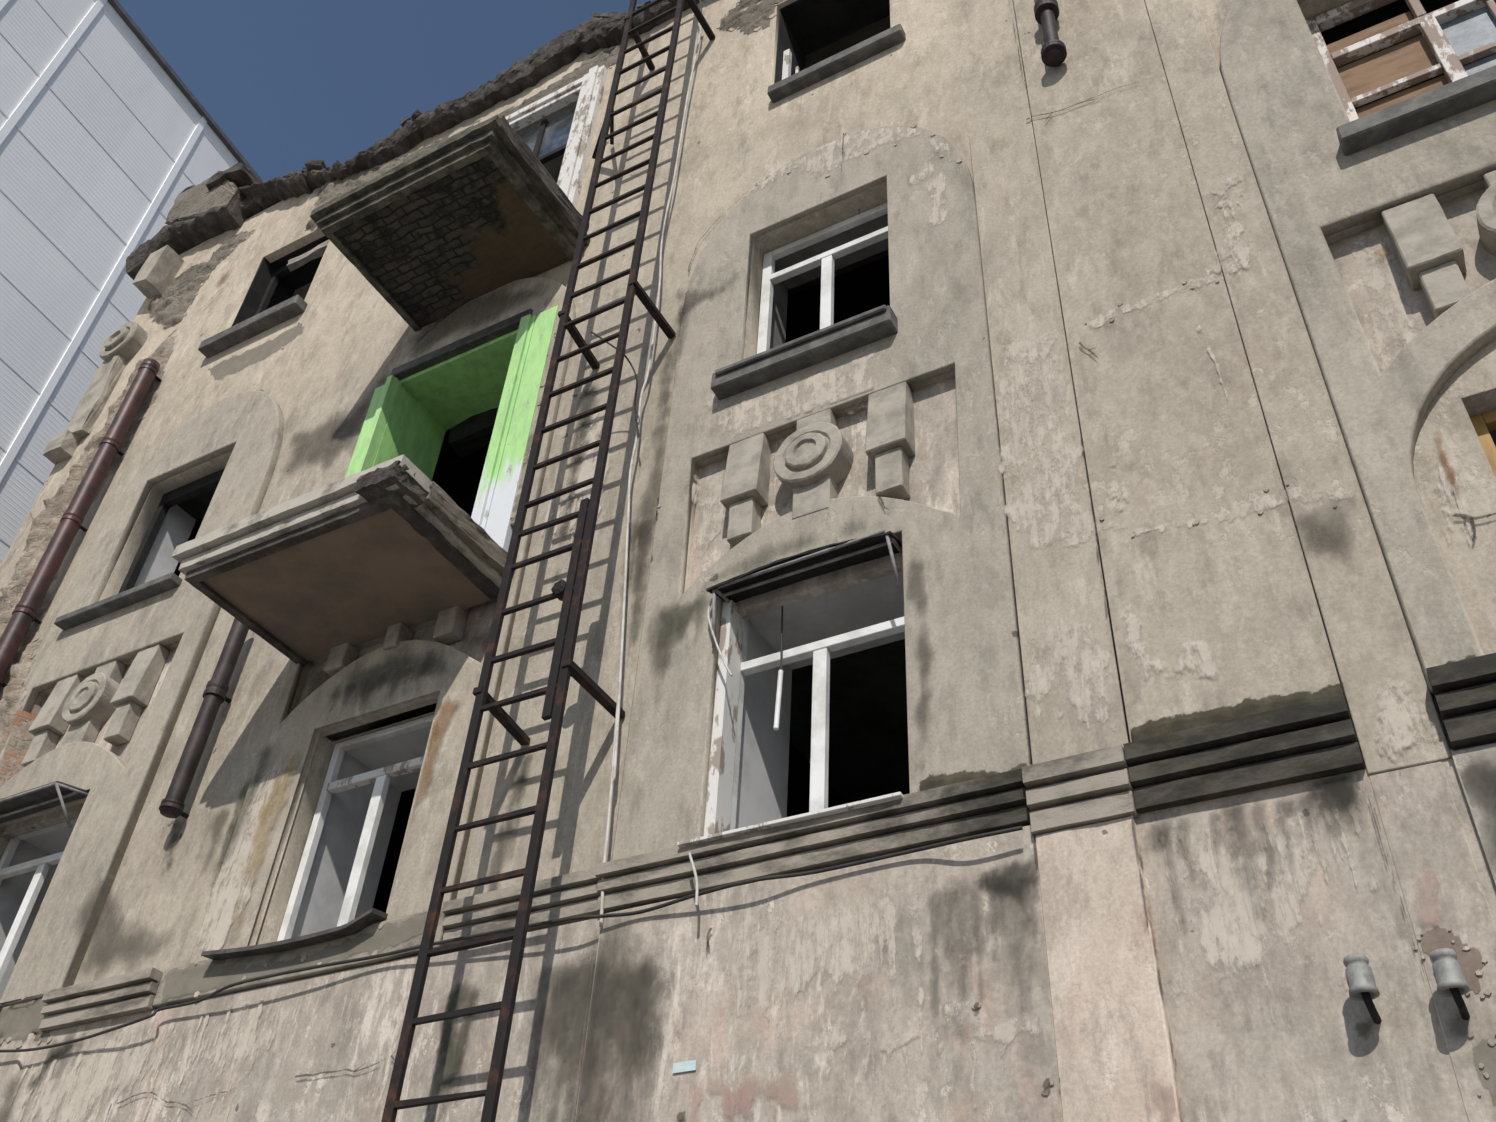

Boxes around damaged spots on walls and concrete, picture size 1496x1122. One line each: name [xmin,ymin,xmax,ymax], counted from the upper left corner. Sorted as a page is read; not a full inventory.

flaking render [716,0,784,35]
peeling [743,124,962,226]
flaking render [0,229,255,637]
flaking render [0,573,58,787]
water stain [198,761,286,951]
water stain [568,939,637,1051]
water stain [1160,803,1379,994]
peeling [1414,925,1492,999]